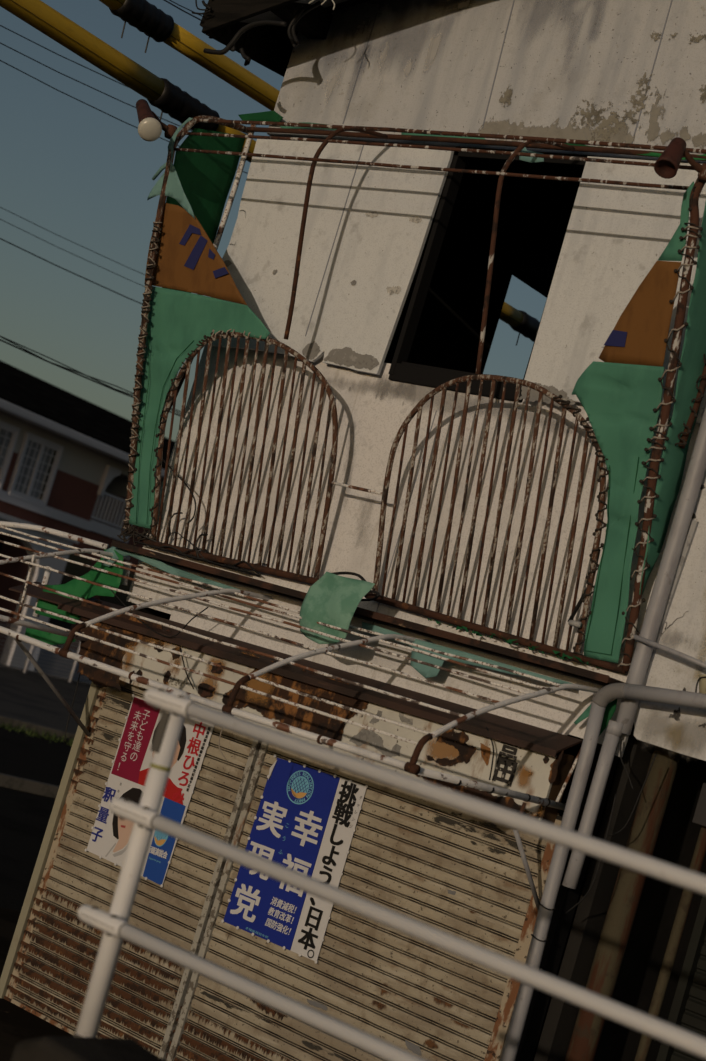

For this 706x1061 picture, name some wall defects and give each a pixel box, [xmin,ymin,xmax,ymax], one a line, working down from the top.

peeling [478,72,706,149]
corrosion [71,598,182,784]
corrosion [198,652,369,741]
corrosion [426,727,491,766]
corrosion [416,775,545,818]
corrosion [519,767,532,786]
corrosion [543,750,564,784]
corrosion [4,886,104,1031]
corrosion [97,939,290,1061]